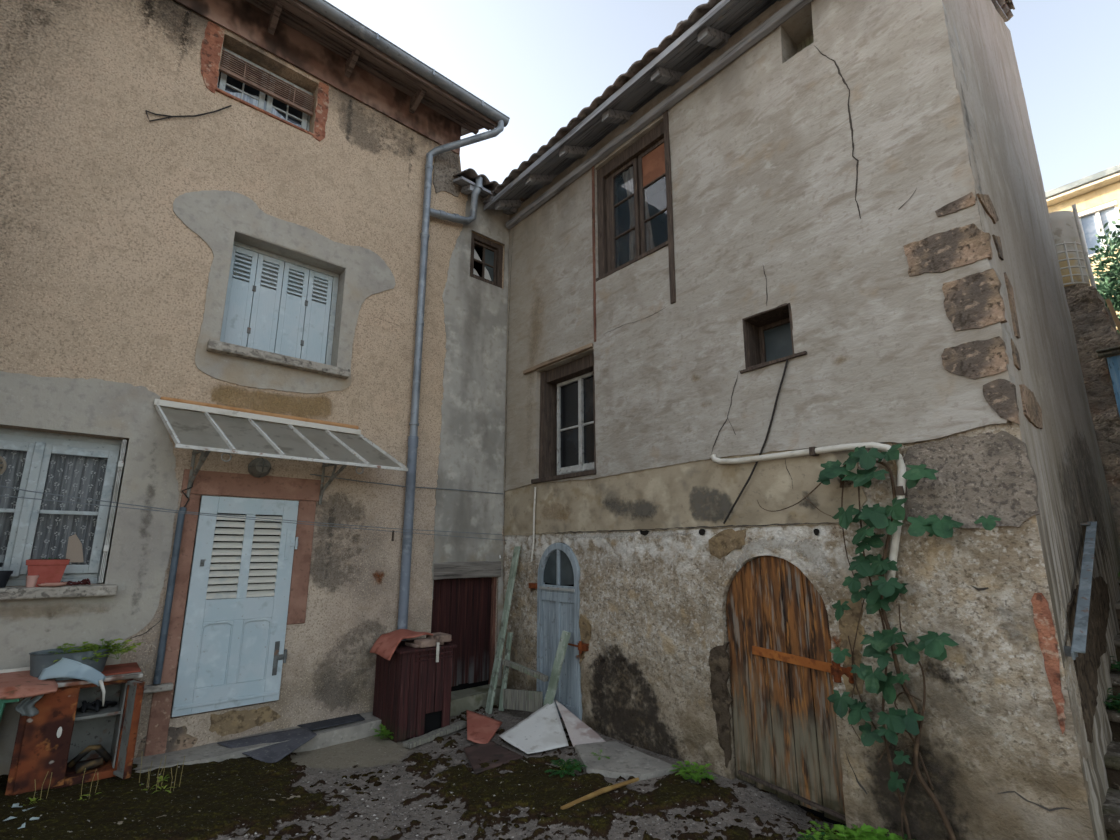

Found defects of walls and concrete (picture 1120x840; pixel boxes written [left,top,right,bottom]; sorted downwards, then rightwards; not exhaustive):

crack [815,46,861,219]
leakage [606,501,656,517]
leakage [690,487,732,523]
leakage [589,646,683,760]
spalling [1031,576,1110,743]